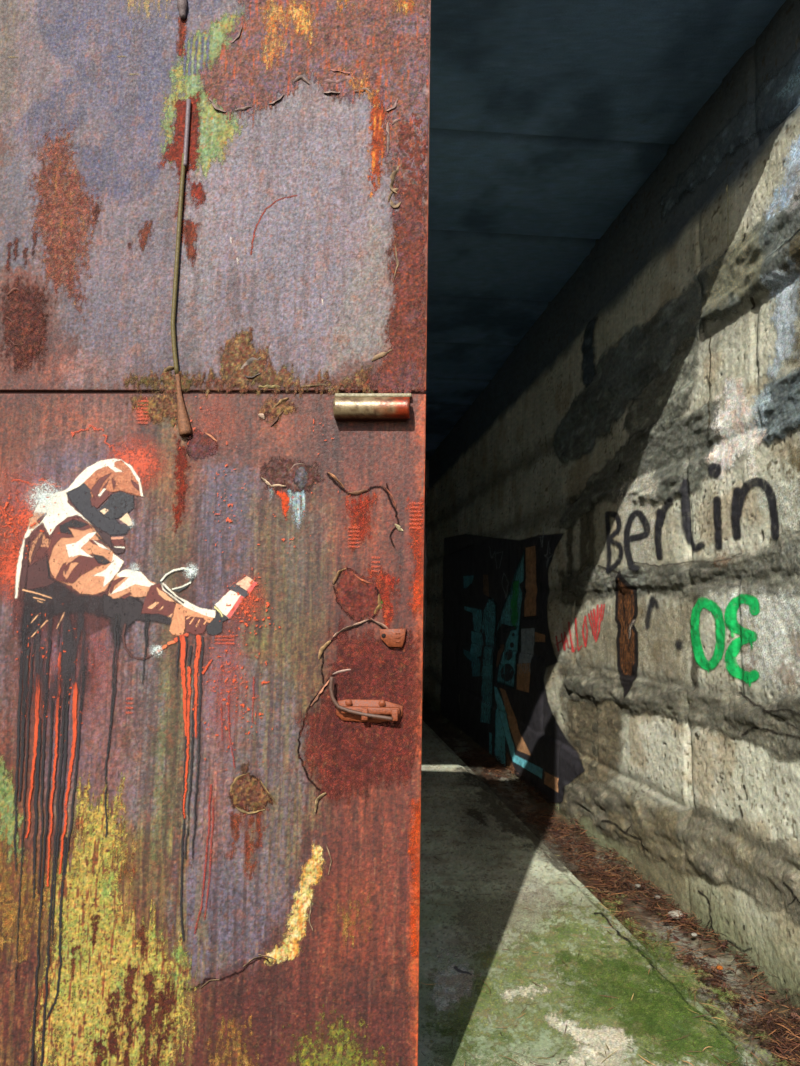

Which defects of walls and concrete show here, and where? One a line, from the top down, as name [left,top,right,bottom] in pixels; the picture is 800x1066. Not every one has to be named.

rust [6,122,105,321]
rust [159,91,206,267]
peeling [123,0,430,427]
rust [366,90,389,197]
damp [701,136,800,377]
peeling [260,457,325,526]
crack [327,472,403,547]
damp [707,378,773,479]
damp [757,439,800,530]
crack [297,618,388,814]
rust [296,493,424,806]
rust [408,802,420,957]